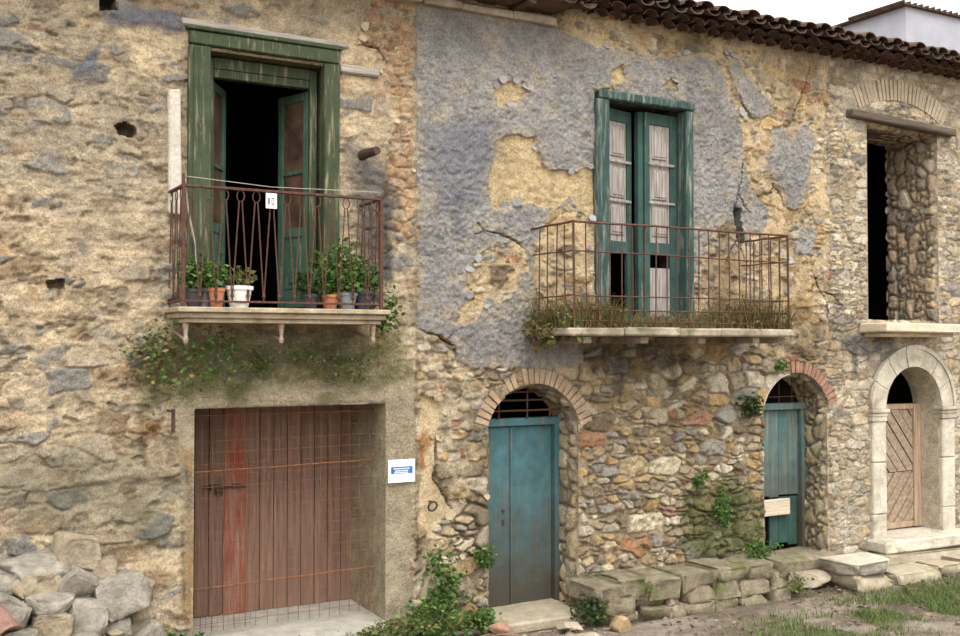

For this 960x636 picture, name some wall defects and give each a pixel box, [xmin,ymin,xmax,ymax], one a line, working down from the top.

peeling [494,75,533,107]
peeling [488,133,597,222]
peeling [557,19,812,311]
crack [733,162,750,213]